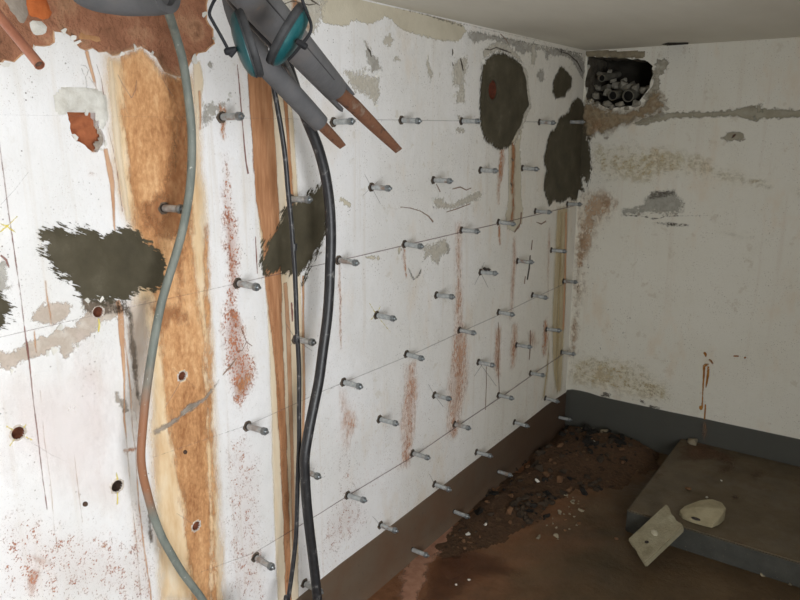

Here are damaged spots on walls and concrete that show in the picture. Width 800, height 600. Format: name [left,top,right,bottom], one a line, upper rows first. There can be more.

spalling [53,87,108,152]
flaking render [0,0,232,129]
peeling [282,0,800,234]
rust [104,149,123,230]
peeling [0,295,130,374]
rust [116,300,133,432]
rust [223,164,255,405]
rust [237,65,305,600]
rust [699,352,713,419]
rust [228,442,261,598]